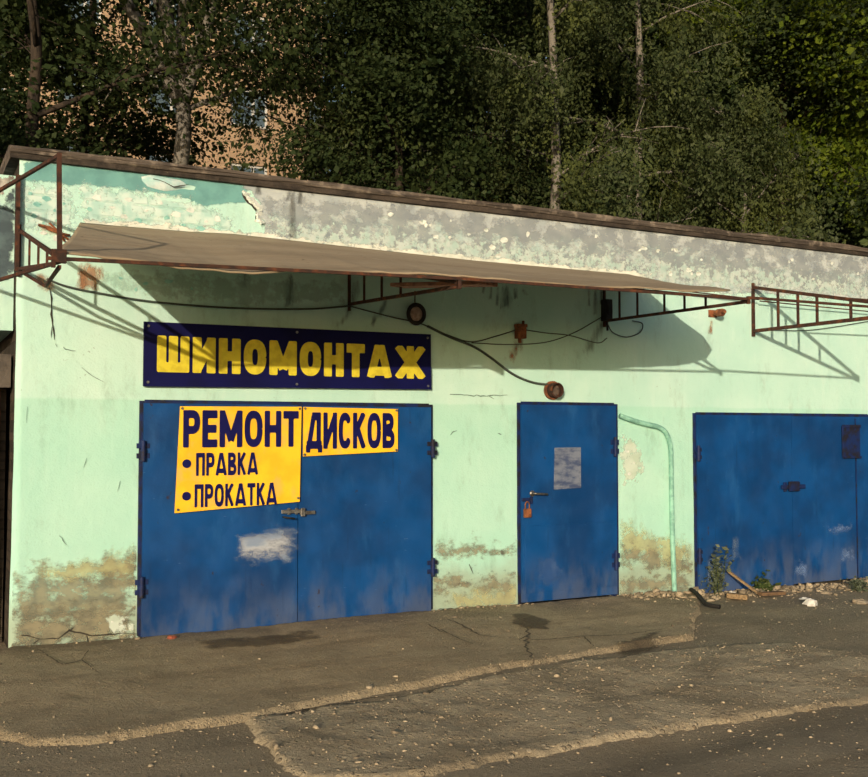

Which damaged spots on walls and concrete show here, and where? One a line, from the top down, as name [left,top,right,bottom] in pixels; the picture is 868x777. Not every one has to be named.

water stain [0,176,15,278]
peeling [20,161,868,304]
corrosion [78,265,100,289]
crack [49,288,74,351]
peeling [619,435,644,486]
water stain [436,545,509,556]
water stain [620,528,692,595]
water stain [12,553,136,646]
water stain [433,574,516,606]
crack [21,627,131,672]
peeling [106,614,133,638]